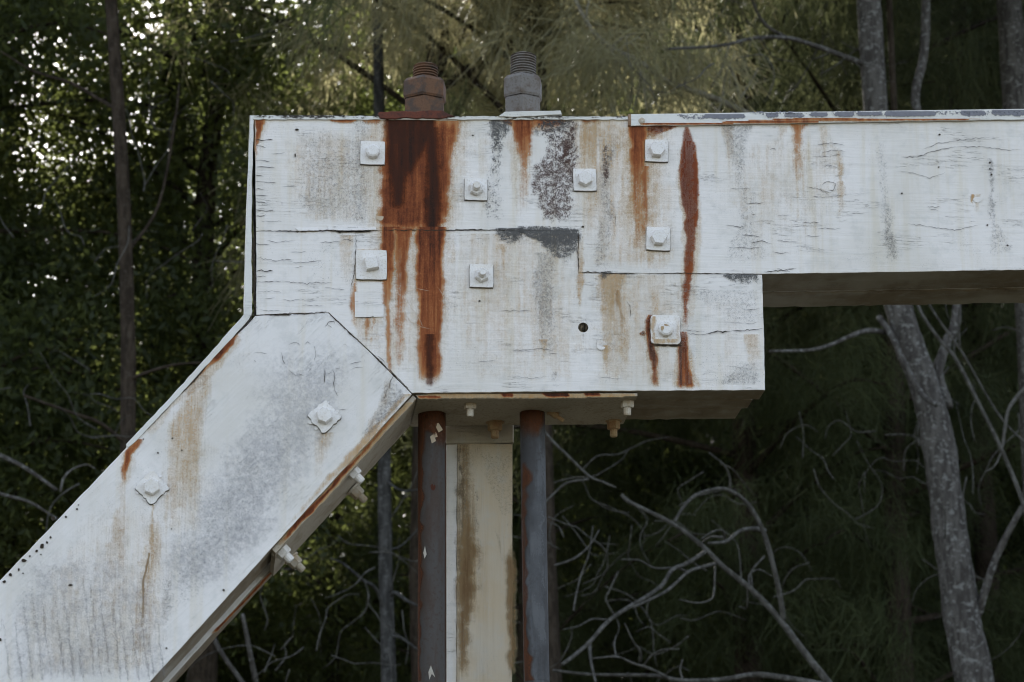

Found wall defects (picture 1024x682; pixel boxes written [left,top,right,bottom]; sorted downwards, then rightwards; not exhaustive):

water stain [486,120,630,348]
corrosion [628,118,969,387]
corrosion [121,439,142,480]
corrosion [280,120,635,681]